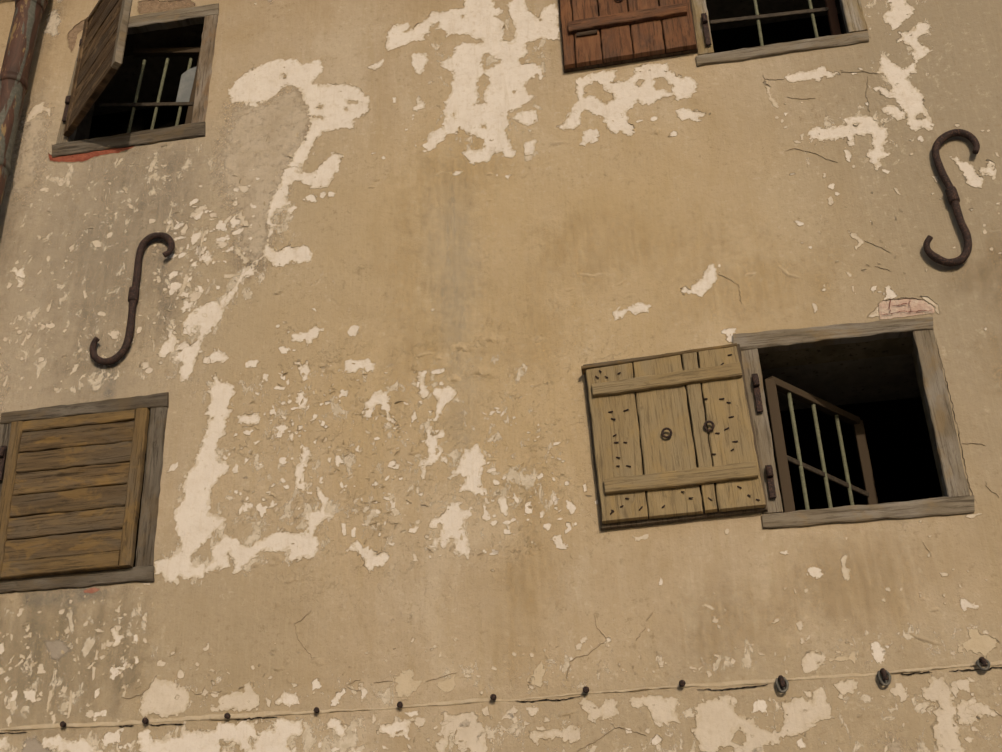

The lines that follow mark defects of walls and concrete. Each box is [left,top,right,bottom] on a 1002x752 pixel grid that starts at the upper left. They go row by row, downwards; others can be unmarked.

peeling [367,0,562,180]
peeling [556,62,712,148]
crack [849,71,878,116]
peeling [948,152,999,189]
peeling [0,58,577,586]
flaking render [867,285,942,321]
peeling [783,567,826,594]
peeling [840,553,852,581]
peeling [0,582,1002,752]